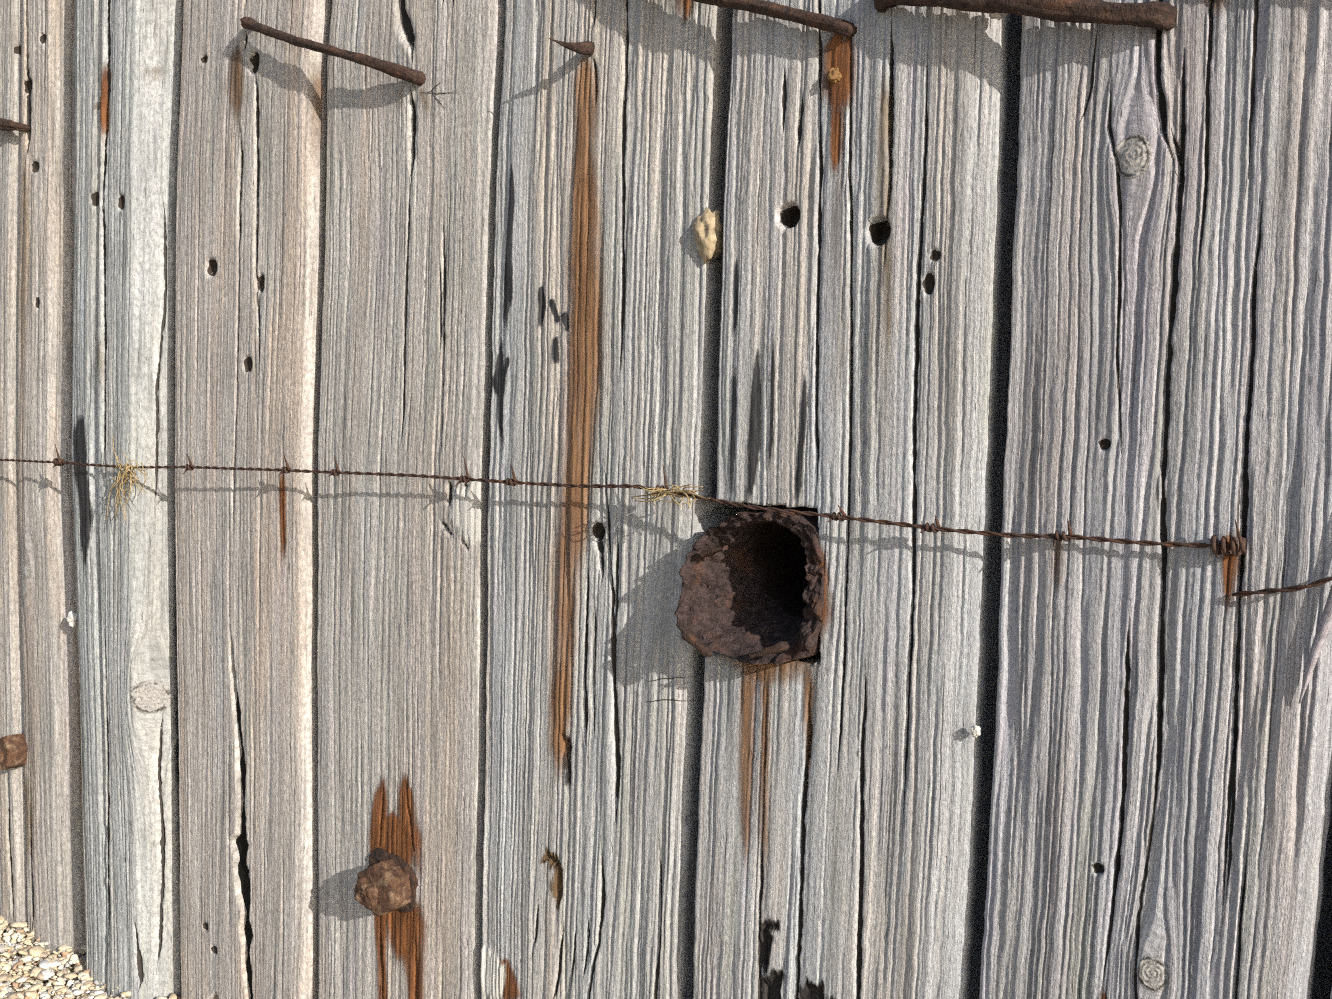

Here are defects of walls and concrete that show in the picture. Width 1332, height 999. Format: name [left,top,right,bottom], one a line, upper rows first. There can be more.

rust [677,0,692,22]
rust [823,33,853,169]
rust [551,60,602,762]
rust [1223,535,1240,604]
rust [739,641,820,845]
crack [236,692,253,999]
rust [370,776,421,866]
rust [374,905,424,999]